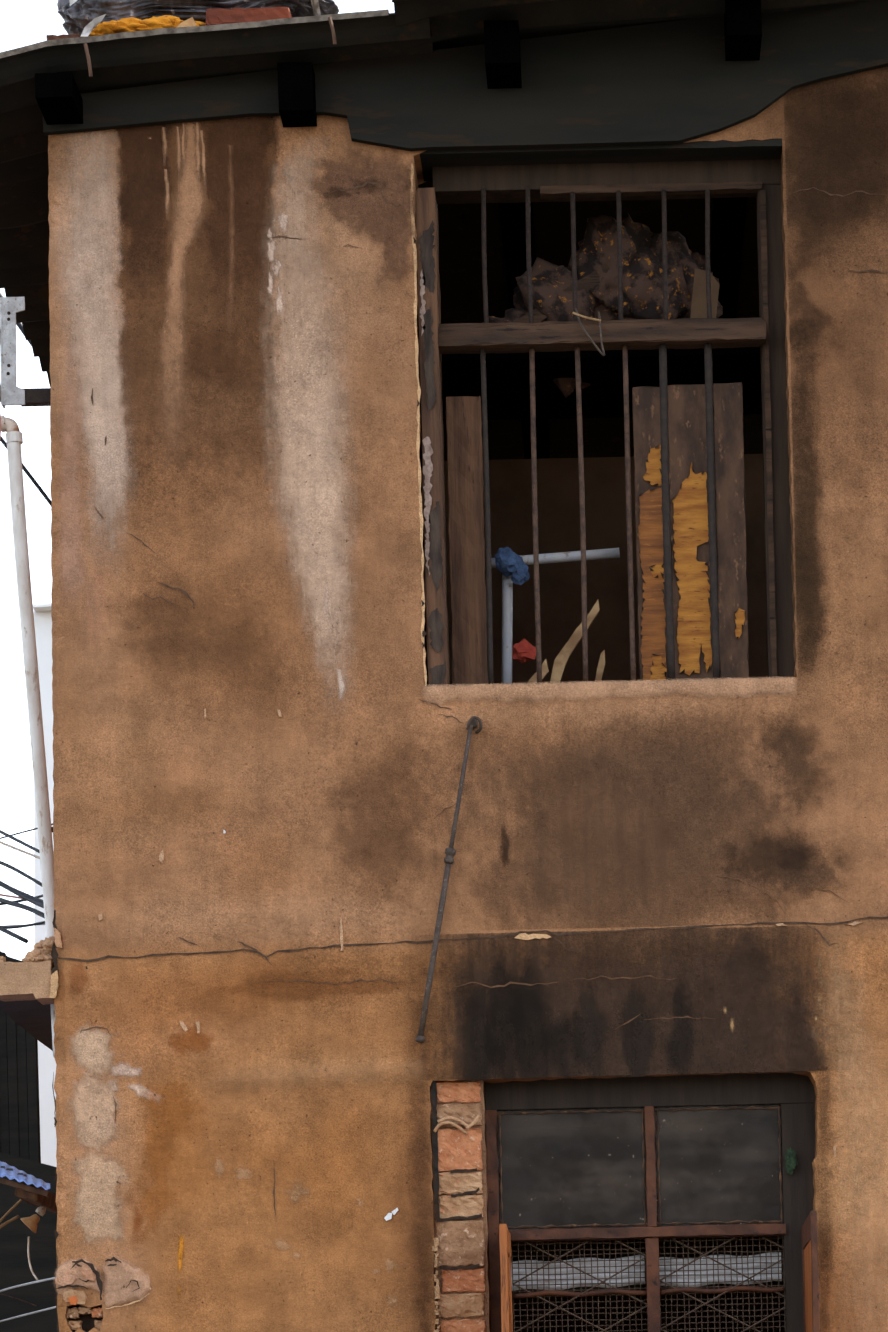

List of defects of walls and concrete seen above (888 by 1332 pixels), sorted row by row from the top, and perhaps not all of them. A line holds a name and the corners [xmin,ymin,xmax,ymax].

leakage [62,116,413,697]
crack [95,507,195,607]
leakage [489,730,839,928]
crack [49,875,888,999]
crack [614,1014,713,1030]
spalling [69,1027,126,1242]
spalling [55,1259,103,1332]